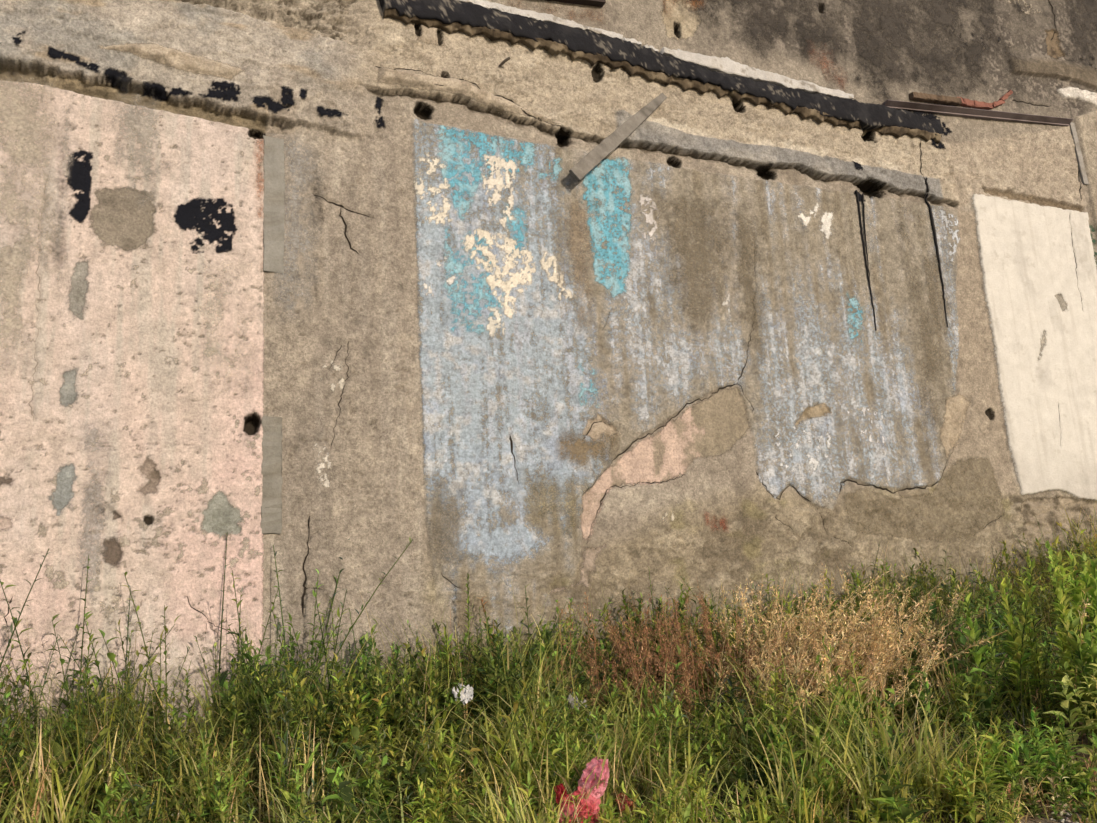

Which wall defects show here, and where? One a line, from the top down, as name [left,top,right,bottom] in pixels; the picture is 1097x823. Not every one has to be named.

leakage [687,0,1019,101]
leakage [1066,0,1097,66]
crack [312,193,372,253]
peeling [413,154,456,224]
peeling [464,155,573,338]
crack [329,342,349,446]
flaking render [552,387,750,592]
crack [582,252,757,543]
flaking render [775,403,832,478]
crack [301,516,322,617]